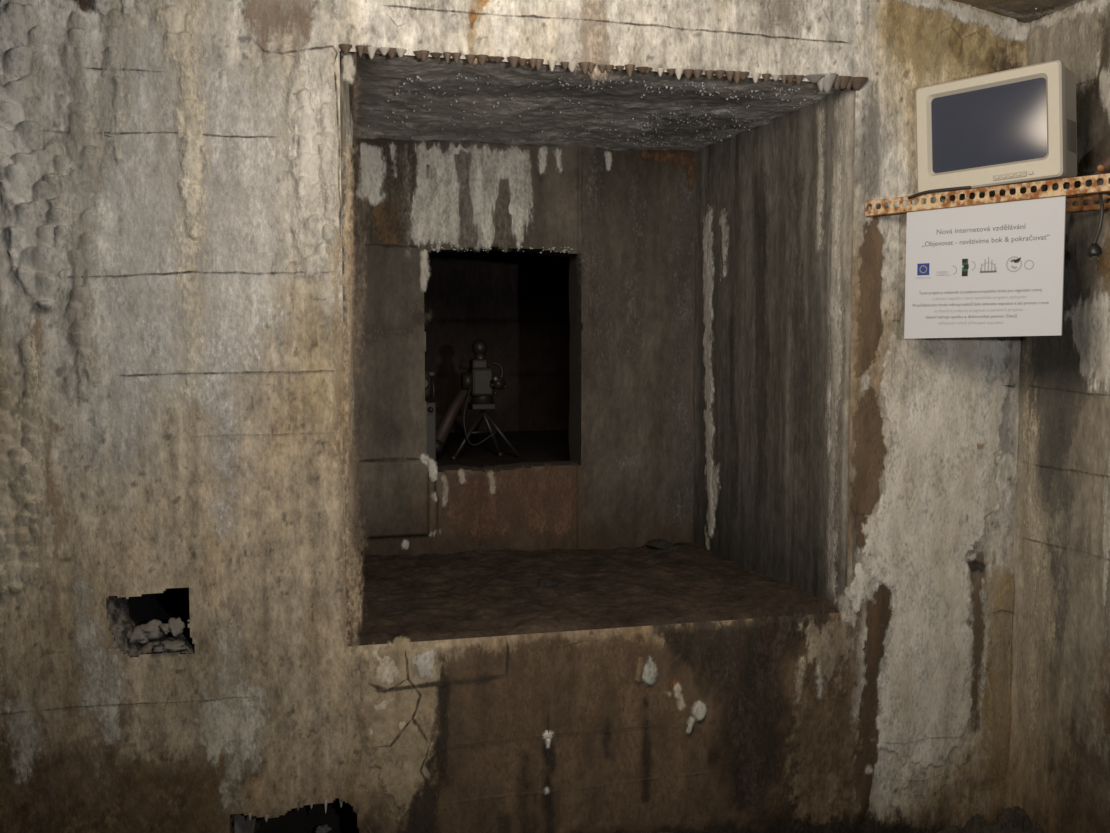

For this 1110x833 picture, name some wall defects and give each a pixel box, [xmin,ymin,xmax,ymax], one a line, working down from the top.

rust [469,0,487,63]
leakage [400,0,767,138]
leakage [883,0,1110,174]
leakage [96,15,286,538]
leakage [328,76,562,651]
leakage [398,83,1110,833]
spalling [850,216,886,551]
leakage [0,581,270,833]
spalling [107,588,195,657]
spalling [254,798,359,833]
crack [369,639,576,786]
spalling [853,583,892,826]